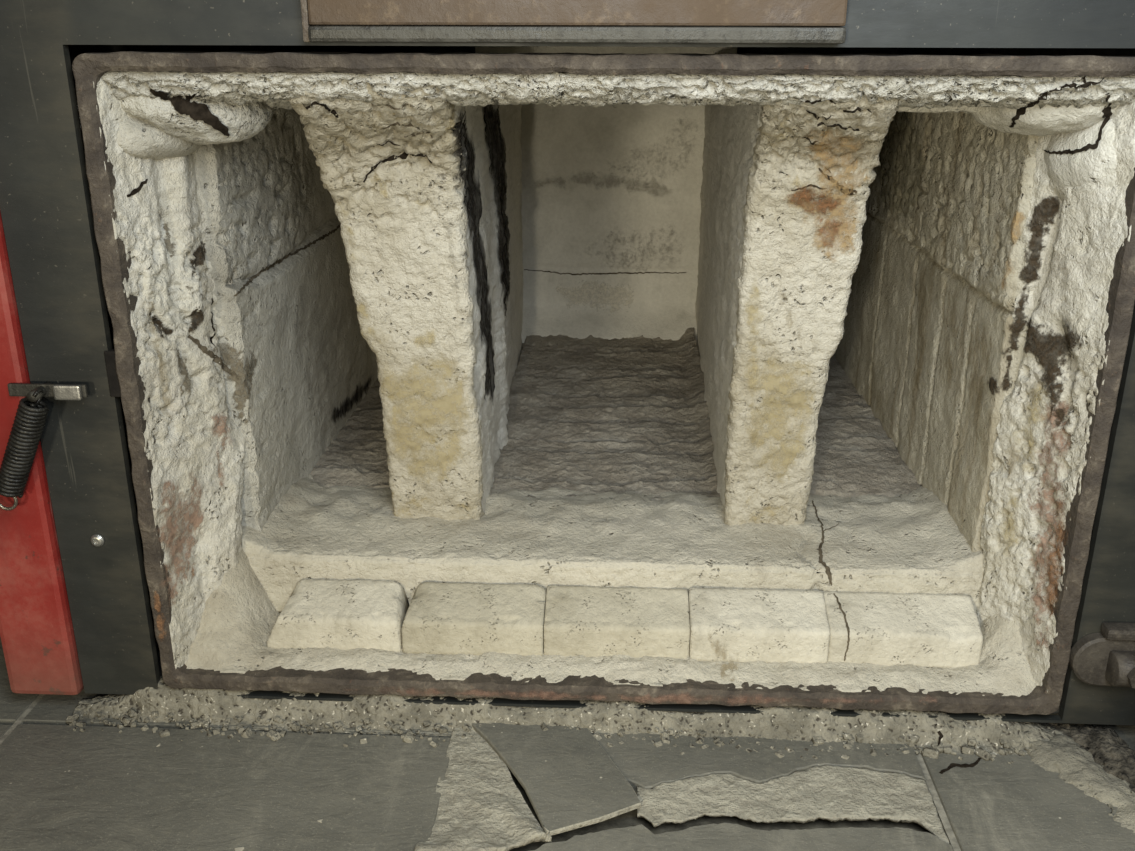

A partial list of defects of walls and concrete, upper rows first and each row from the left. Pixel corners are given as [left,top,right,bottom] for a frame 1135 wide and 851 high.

crack [150,88,230,137]
crack [363,103,433,183]
crack [1009,76,1112,155]
rust [789,130,868,257]
leakage [452,104,510,399]
crack [812,500,850,661]
rust [638,695,690,704]
spalling [415,727,552,851]
spalling [637,765,949,844]